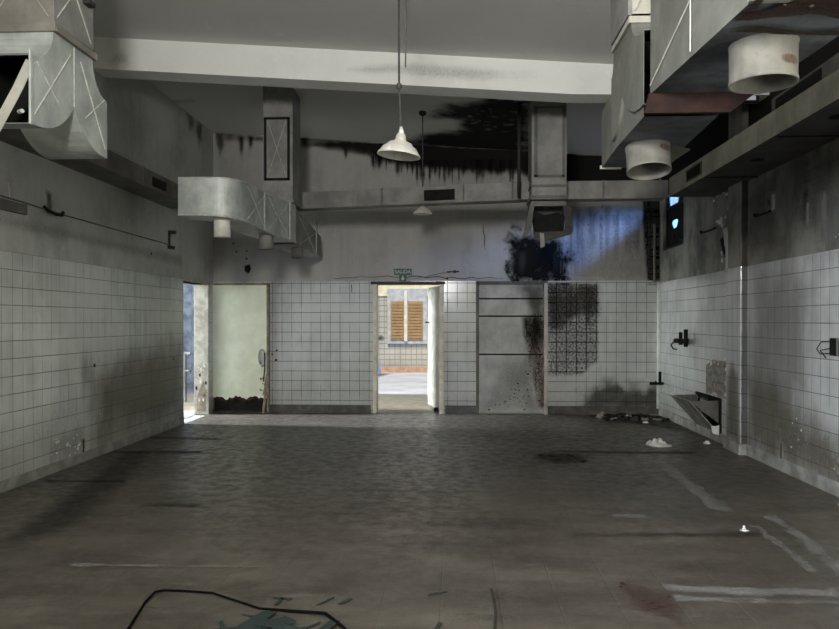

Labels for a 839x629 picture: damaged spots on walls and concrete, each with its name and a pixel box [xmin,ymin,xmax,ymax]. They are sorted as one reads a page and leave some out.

rust [735,0,839,36]
water stain [371,156,514,180]
water stain [505,226,598,375]
water stain [728,181,839,475]